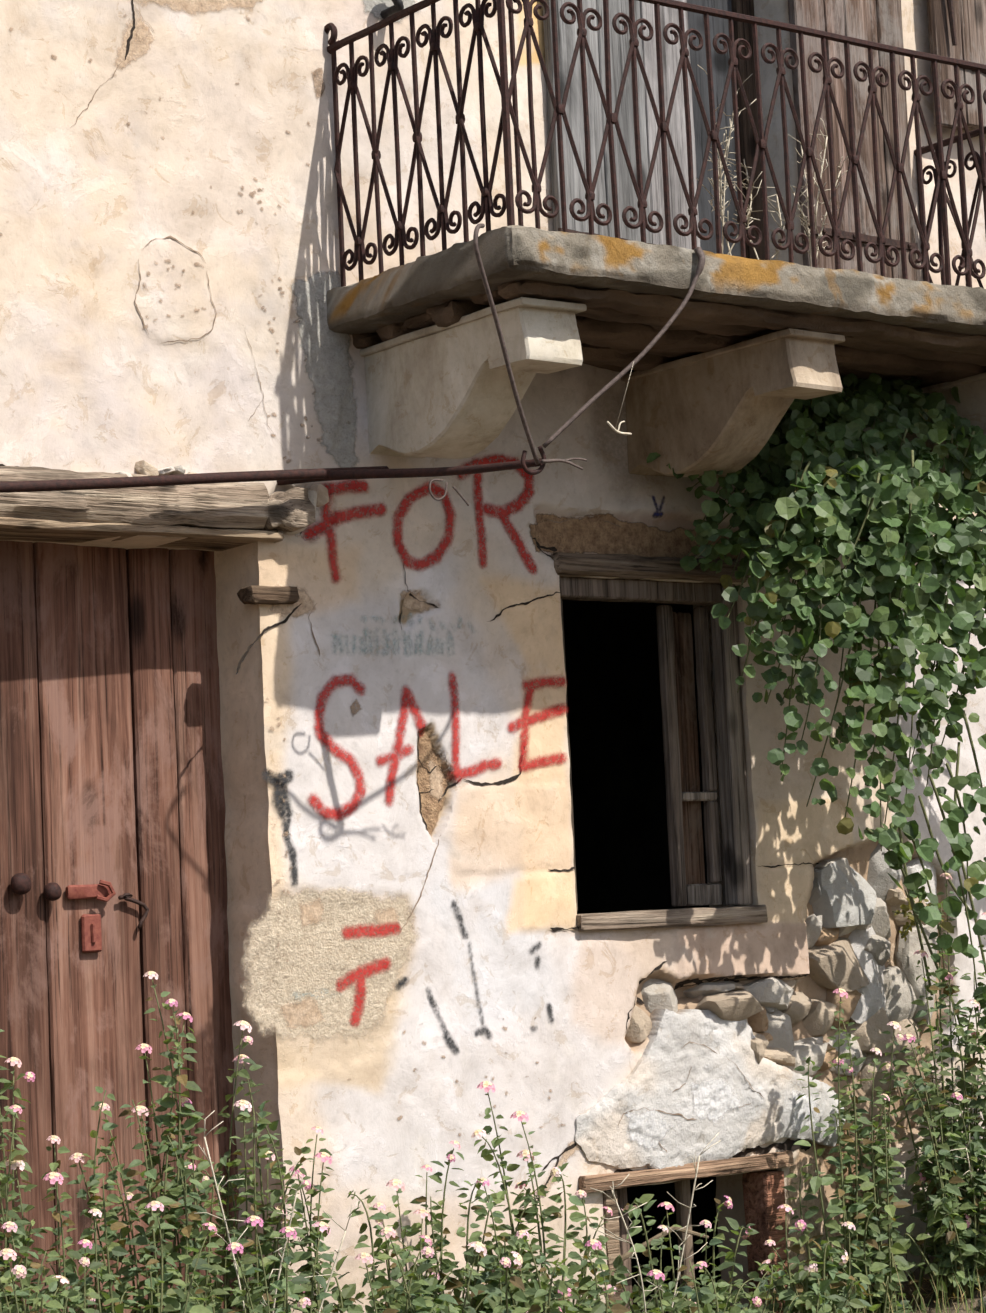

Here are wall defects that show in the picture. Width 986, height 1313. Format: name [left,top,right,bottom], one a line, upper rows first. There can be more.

crack [70,0,154,128]
crack [236,586,320,674]
crack [487,591,560,622]
peeling [417,728,443,831]
peeling [375,909,397,926]
crack [398,835,441,936]